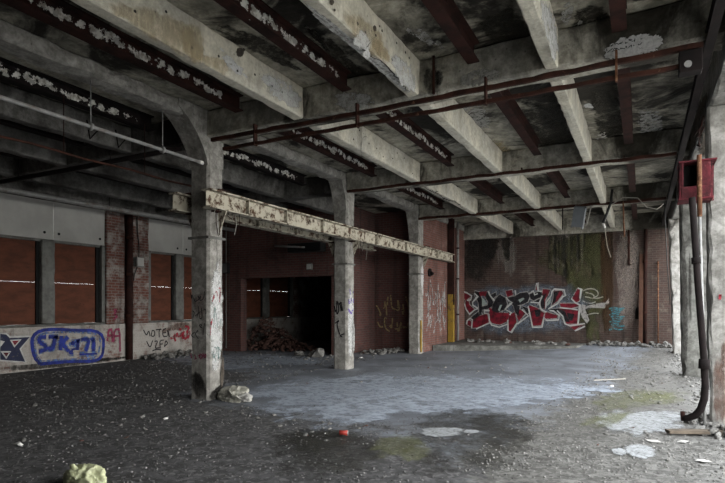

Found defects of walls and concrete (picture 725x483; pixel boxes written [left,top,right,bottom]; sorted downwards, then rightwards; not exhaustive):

spalling [305,0,409,92]
water stain [592,90,623,138]
water stain [464,238,510,281]